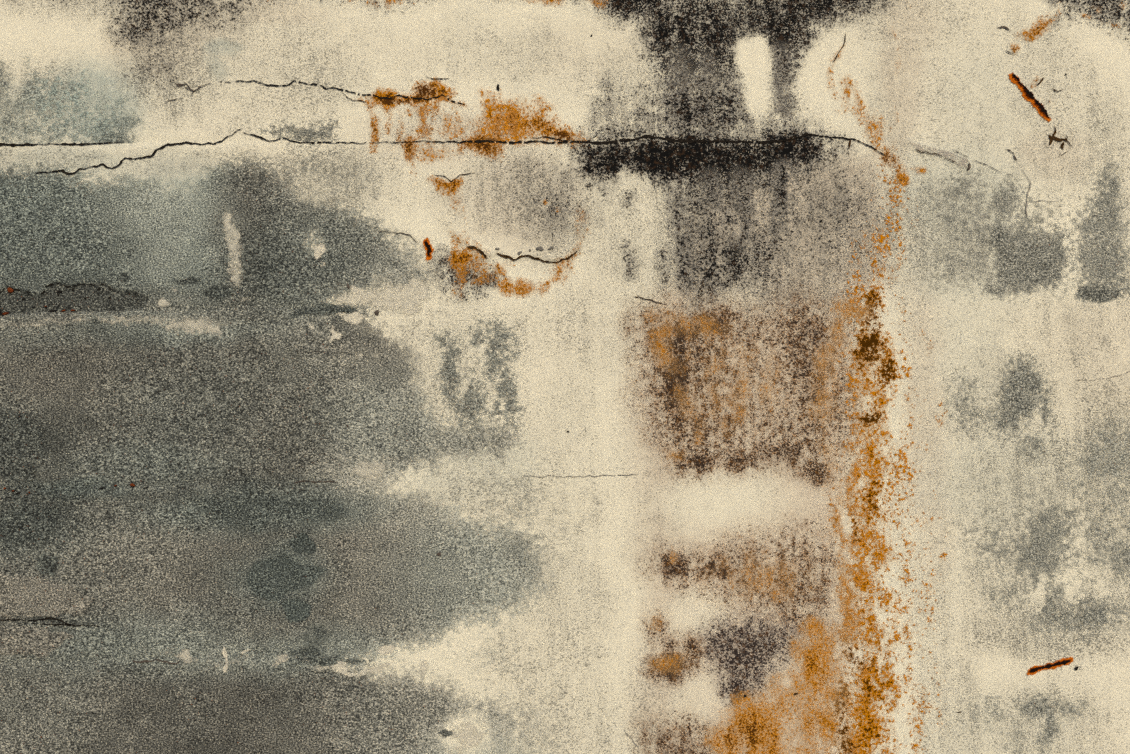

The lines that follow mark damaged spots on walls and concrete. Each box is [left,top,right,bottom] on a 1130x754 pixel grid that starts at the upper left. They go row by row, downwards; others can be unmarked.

damp [1,213,257,339]
damp [3,0,281,91]
crack [166,75,465,105]
crack [0,128,885,175]
corrosion [358,78,598,300]
damp [504,0,899,489]
corrosion [1011,11,1060,52]
damp [1044,0,1130,46]
damp [0,409,45,485]
peeling [0,50,590,754]
corrosion [644,310,791,444]
corrosion [703,45,948,754]